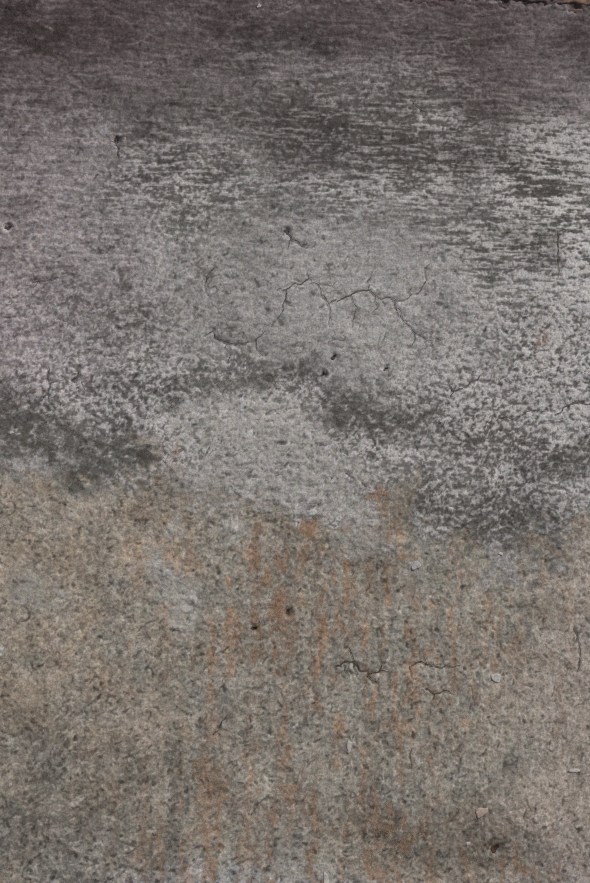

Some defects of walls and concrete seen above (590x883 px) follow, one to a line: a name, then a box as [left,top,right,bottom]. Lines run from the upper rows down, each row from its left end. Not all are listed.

crack [206,266,445,363]
leakage [0,390,56,462]
leakage [67,431,152,490]
leakage [331,396,438,435]